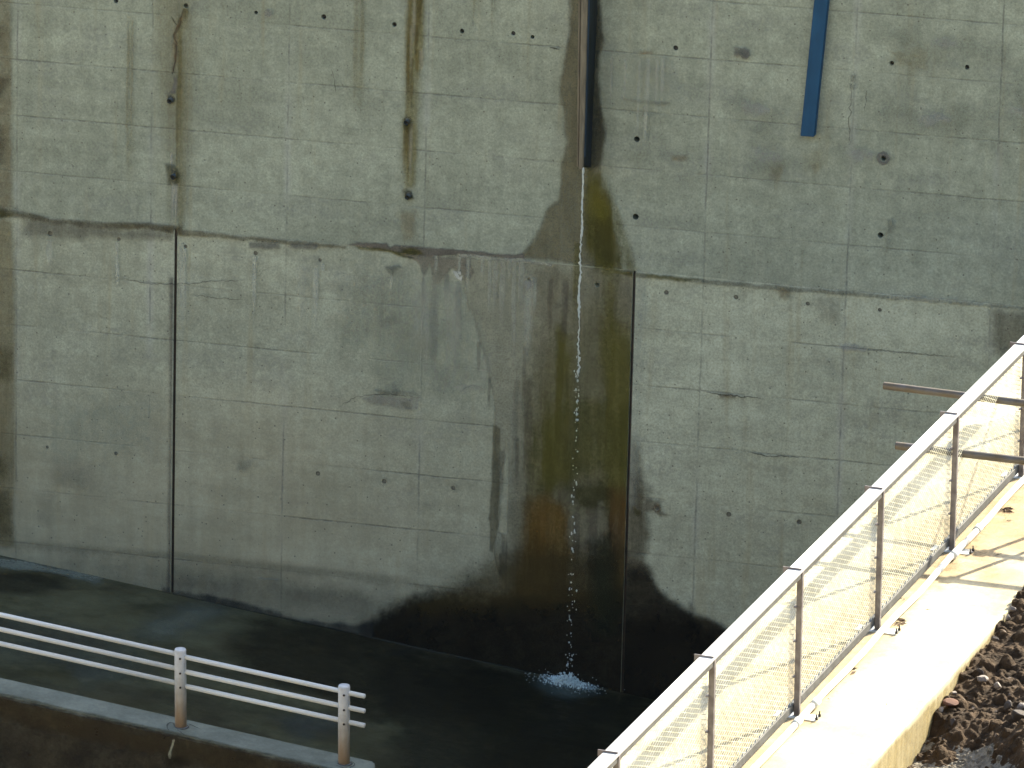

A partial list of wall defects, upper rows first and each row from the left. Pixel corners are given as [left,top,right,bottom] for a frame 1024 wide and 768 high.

corrosion [407,0,422,83]
corrosion [404,106,415,198]
leakage [148,0,726,768]